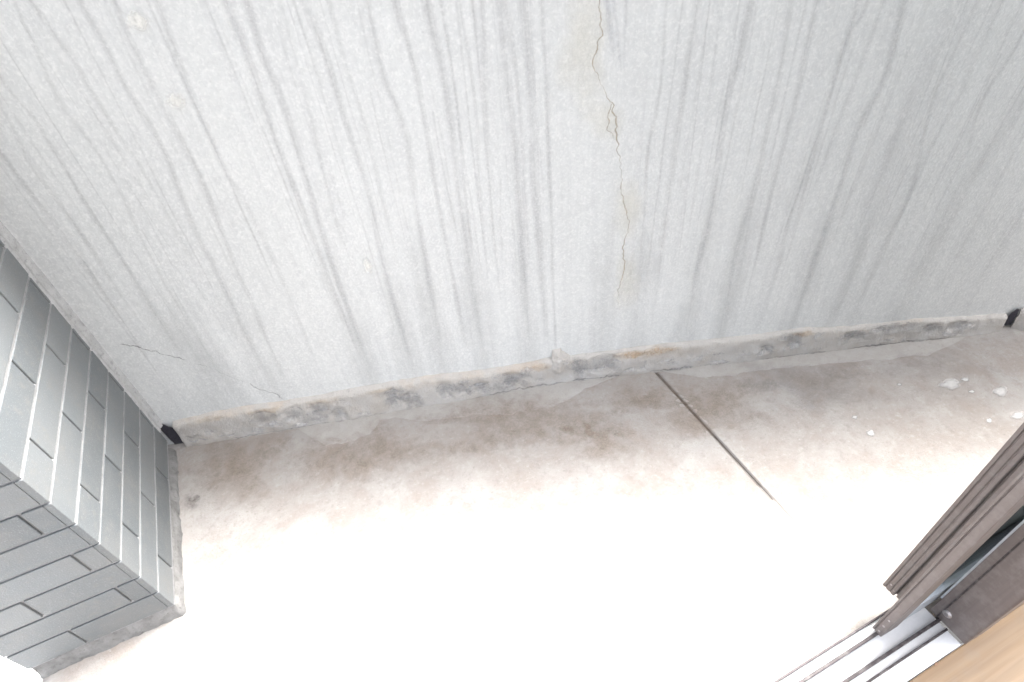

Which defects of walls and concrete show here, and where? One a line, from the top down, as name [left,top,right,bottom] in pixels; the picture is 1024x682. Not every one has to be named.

crack [592,0,620,160]